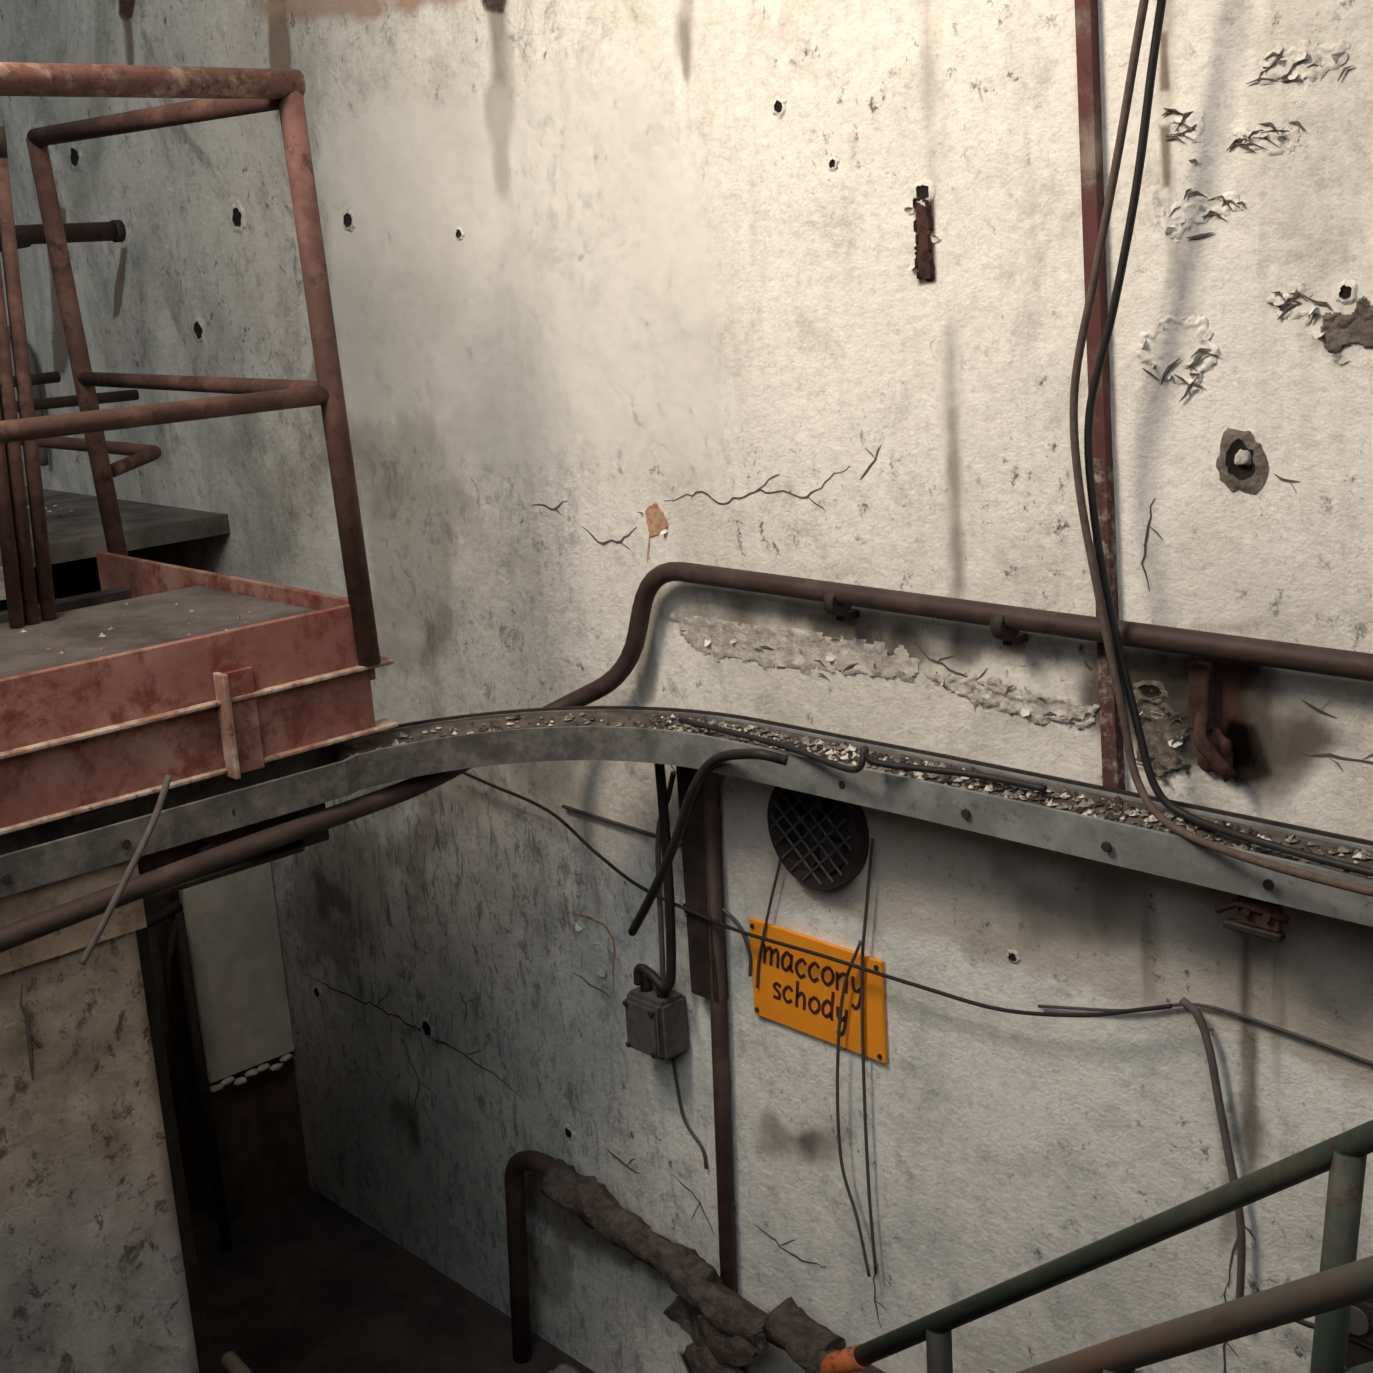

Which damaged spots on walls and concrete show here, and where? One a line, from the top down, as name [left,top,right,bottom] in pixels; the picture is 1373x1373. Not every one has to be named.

water stain [482,0,506,13]
spalling [1246,39,1354,85]
spalling [1161,108,1204,165]
spalling [1226,121,1305,155]
spalling [1165,188,1246,242]
spalling [1265,279,1373,364]
spalling [1136,314,1220,402]
crack [664,445,881,512]
crack [534,501,637,550]
spalling [668,611,1100,731]
spalling [1132,680,1191,785]